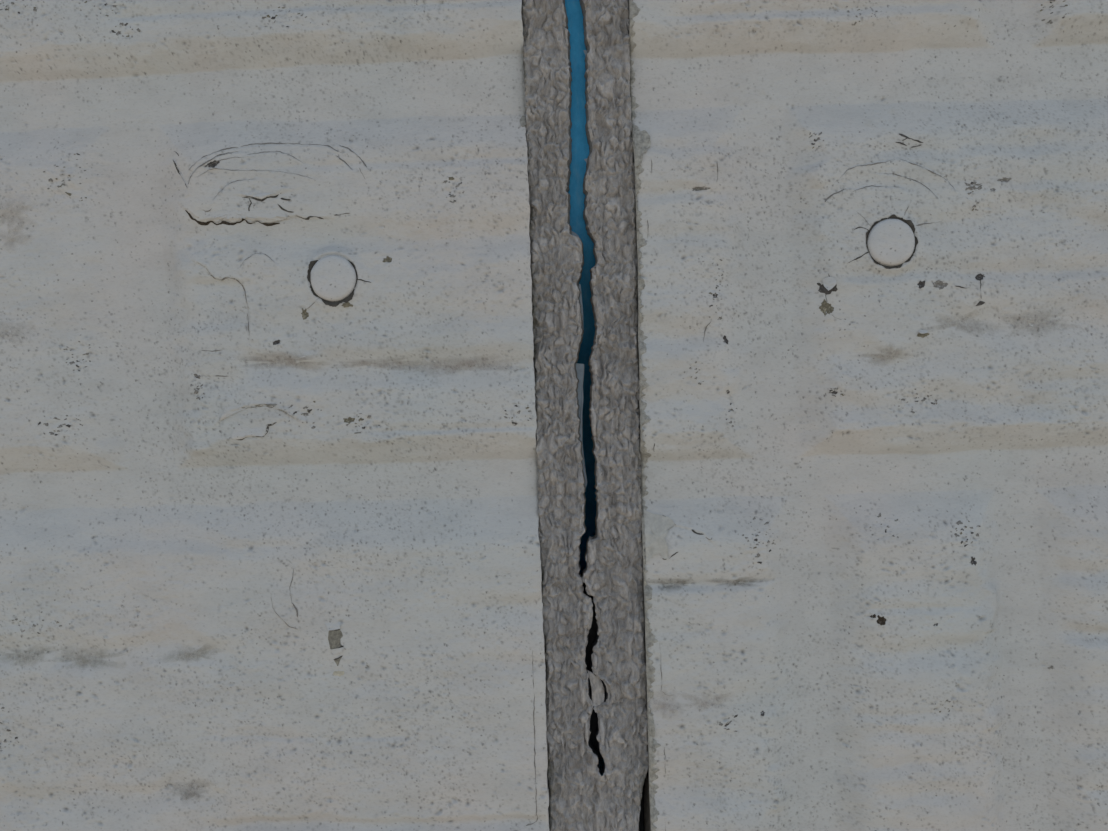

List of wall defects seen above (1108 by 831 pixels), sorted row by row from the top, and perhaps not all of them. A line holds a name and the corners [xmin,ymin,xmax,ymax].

peeling [185,192,349,226]
crack [563,0,608,775]
peeling [324,622,344,677]
crack [639,744,651,831]